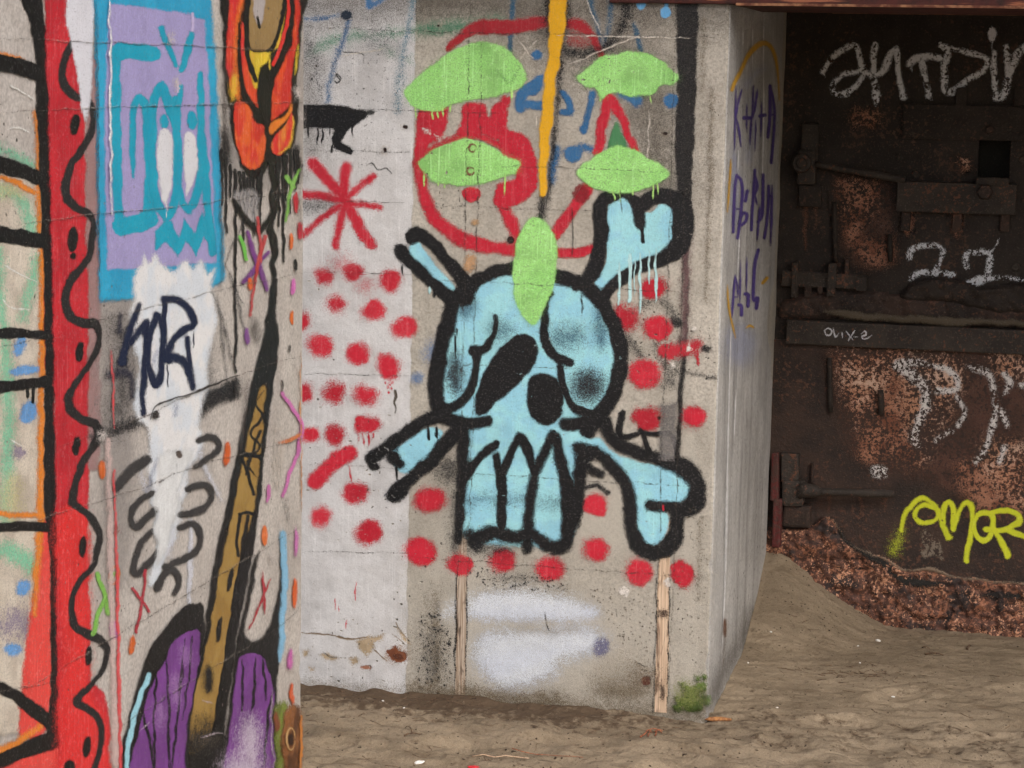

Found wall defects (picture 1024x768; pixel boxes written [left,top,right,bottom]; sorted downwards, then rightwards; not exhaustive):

corrosion [802,173,916,275]
corrosion [820,345,1024,526]